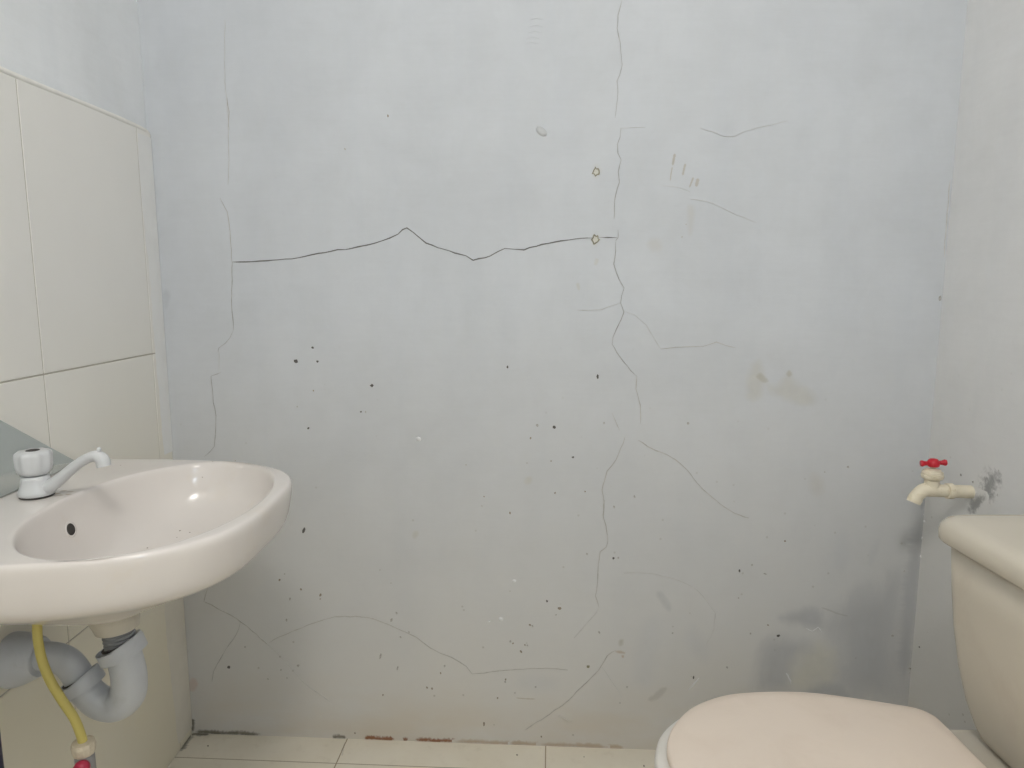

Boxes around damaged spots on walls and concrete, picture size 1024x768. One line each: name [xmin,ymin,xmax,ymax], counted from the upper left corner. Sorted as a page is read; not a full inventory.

crack [204,1,748,638]
crack [204,588,620,729]
water stain [742,498,925,706]